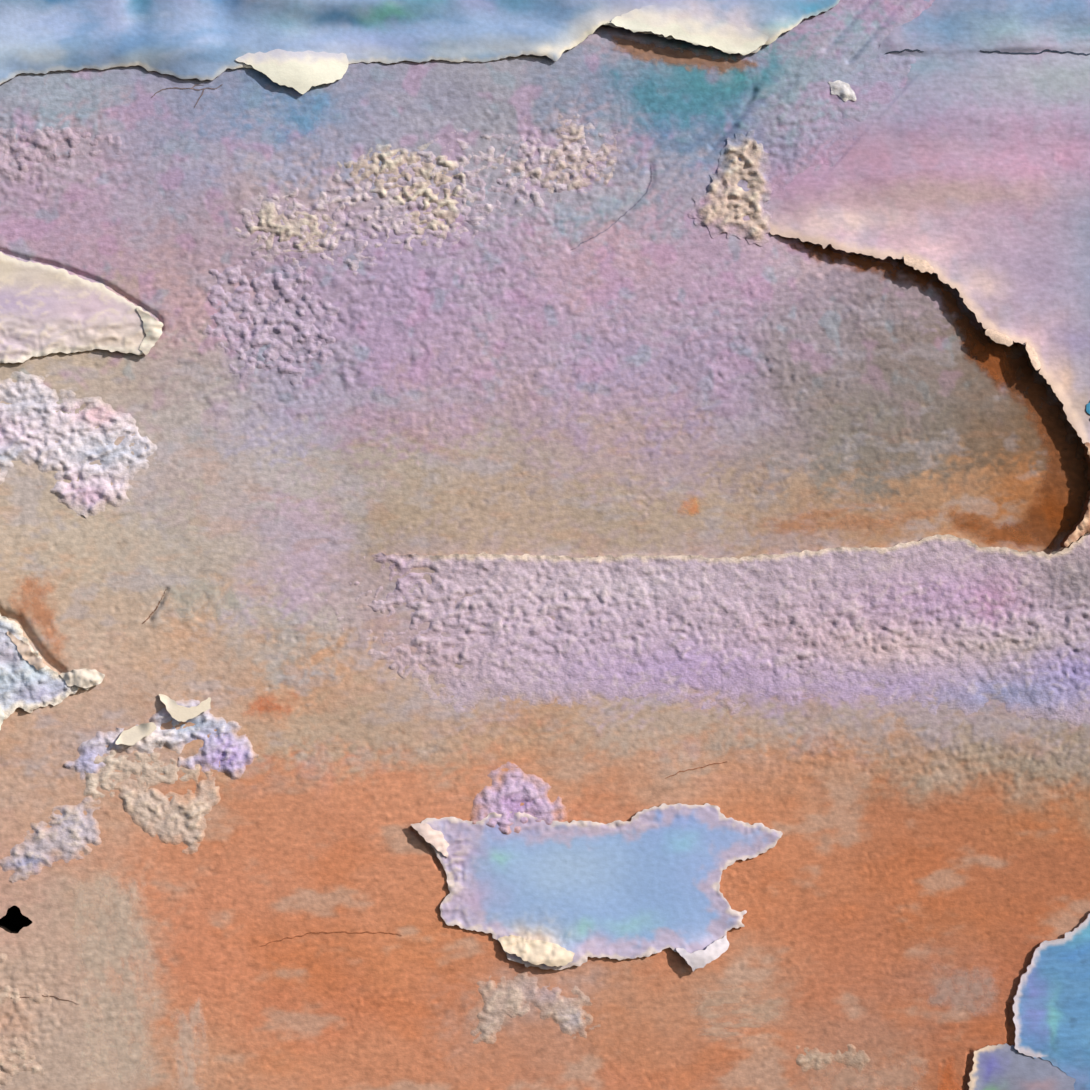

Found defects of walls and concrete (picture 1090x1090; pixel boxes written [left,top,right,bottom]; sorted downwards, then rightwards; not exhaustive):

flaking render [0,125,123,184]
peeling [0,252,163,519]
flaking render [202,109,622,393]
peeling [0,0,840,95]
flaking render [336,0,1090,727]
corrosion [787,238,1090,549]
peeling [0,614,105,730]
peeling [0,694,259,883]
peeling [410,761,783,1044]
peeling [967,913,1090,1090]